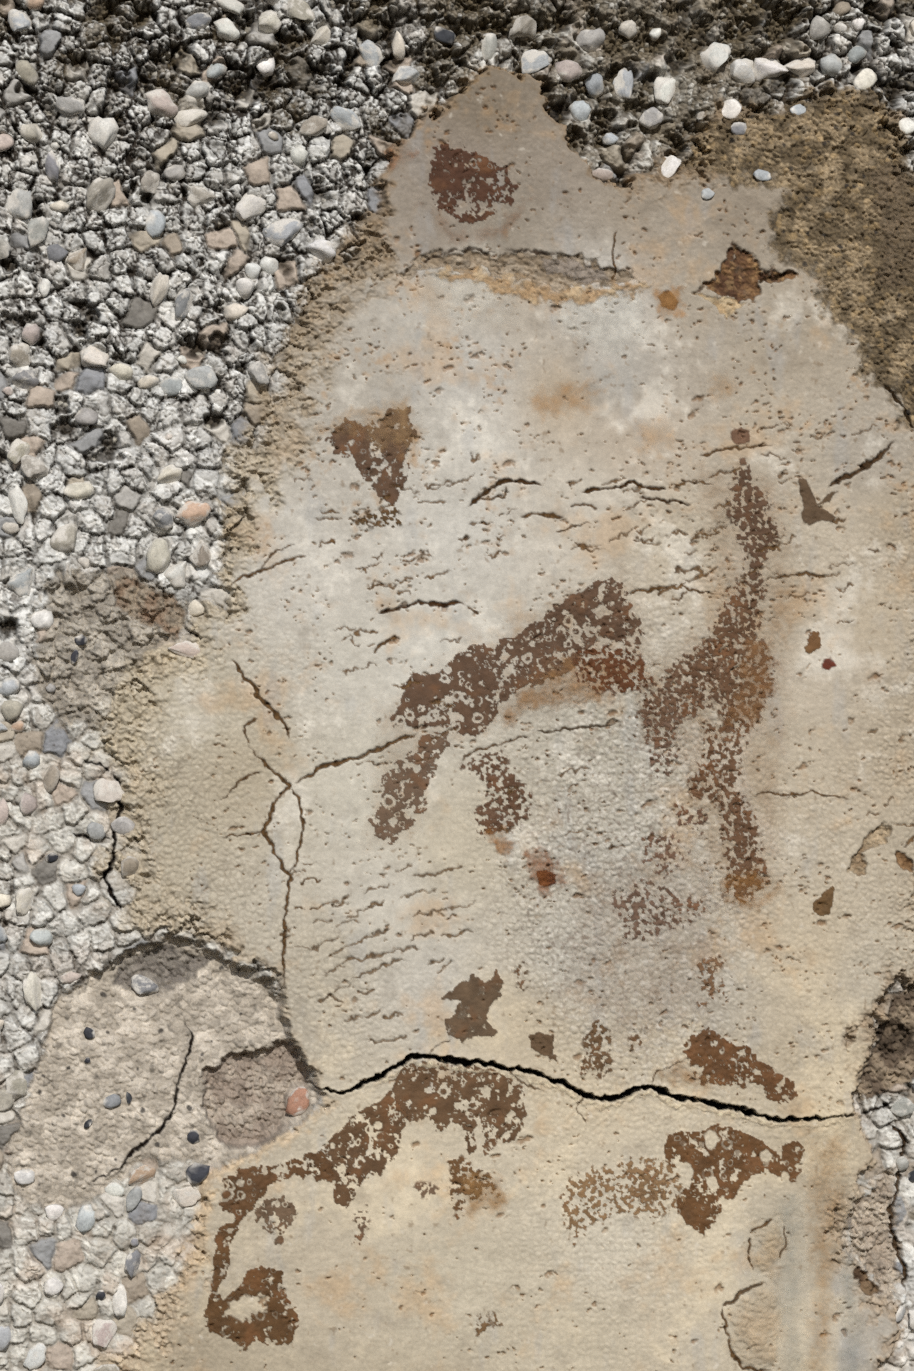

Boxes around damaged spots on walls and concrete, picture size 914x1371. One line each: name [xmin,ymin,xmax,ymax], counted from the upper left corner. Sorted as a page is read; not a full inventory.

corrosion [428,143,518,224]
spalling [681,87,914,428]
corrosion [325,406,417,527]
crack [226,385,914,1127]
corrosion [368,427,779,944]
crack [93,1027,194,1182]
spalling [7,934,325,1214]
corrosion [441,961,528,1042]
corrosion [683,1027,798,1104]
spalling [857,992,914,1100]
corrosion [204,1061,527,1351]
corrosion [559,1124,805,1246]